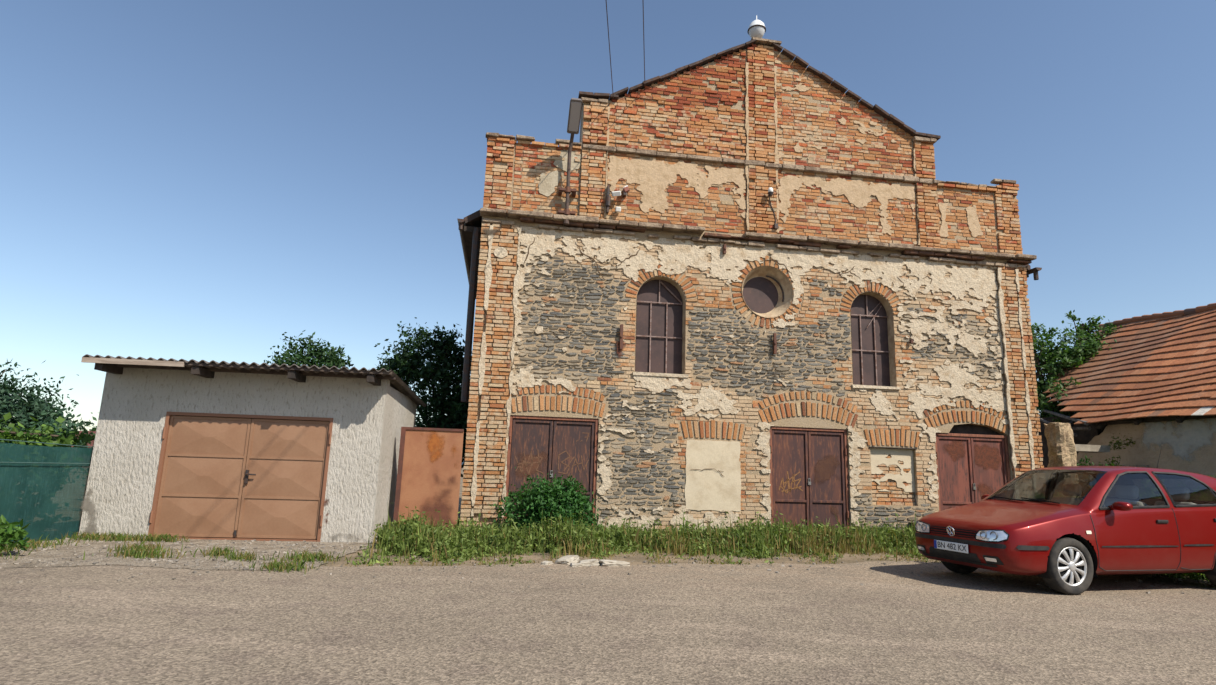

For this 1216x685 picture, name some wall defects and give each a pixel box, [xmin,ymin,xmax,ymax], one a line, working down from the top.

flaking render [777,77,819,100]
flaking render [838,104,896,152]
flaking render [607,155,747,218]
flaking render [778,116,915,235]
spalling [808,277,846,300]
spalling [686,307,851,400]
spalling [896,296,1003,379]
spalling [514,248,686,530]
peeling [1143,419,1216,460]
spalling [852,494,935,531]